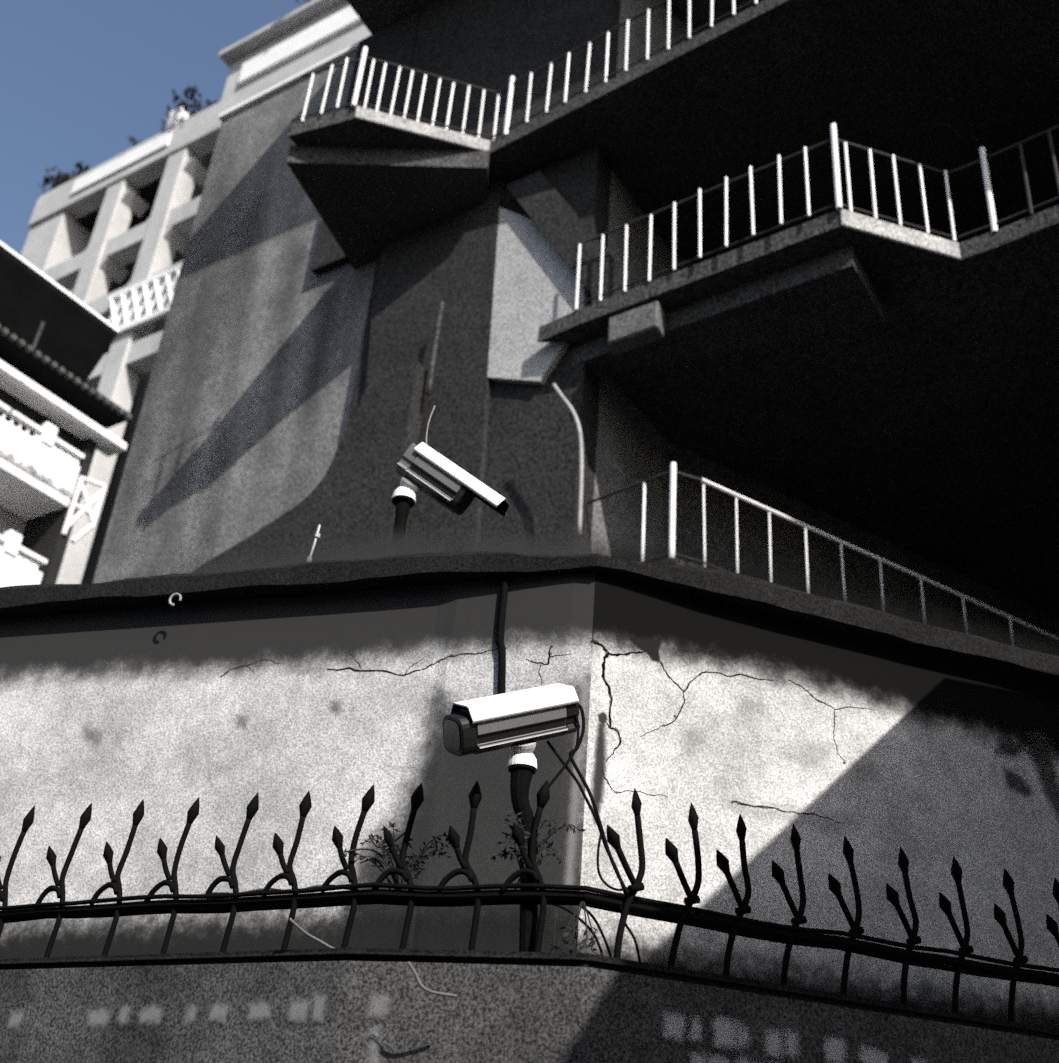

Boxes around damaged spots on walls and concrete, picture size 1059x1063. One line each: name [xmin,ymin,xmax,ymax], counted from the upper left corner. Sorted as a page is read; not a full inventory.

crack [327,648,498,676]
crack [526,645,568,685]
crack [591,639,872,797]
crack [731,800,845,823]